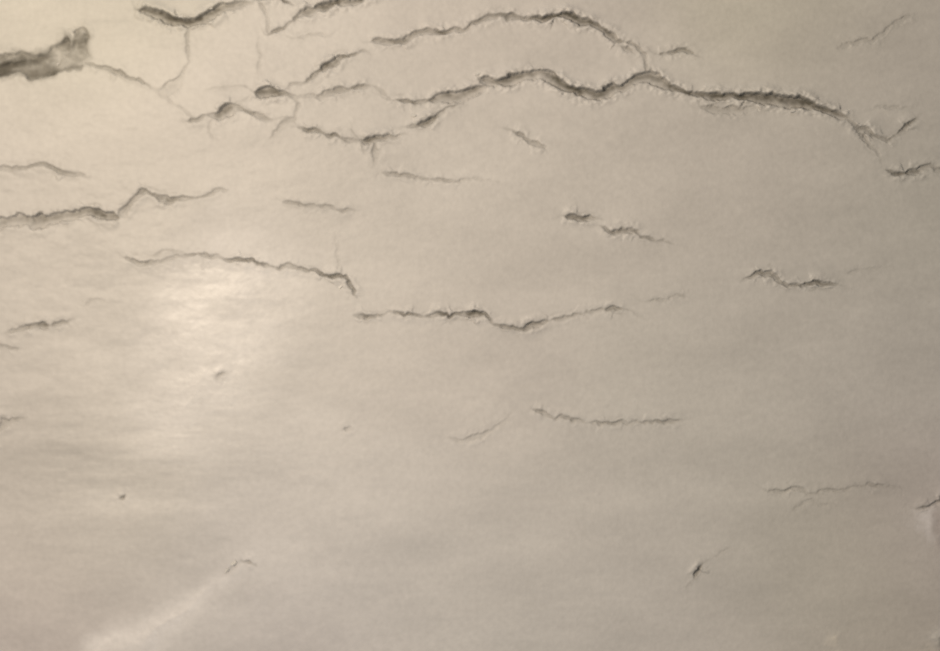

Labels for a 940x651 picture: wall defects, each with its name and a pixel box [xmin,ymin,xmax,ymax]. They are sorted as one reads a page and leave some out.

crack [0,0,940,337]
crack [0,294,111,358]
crack [438,403,703,446]